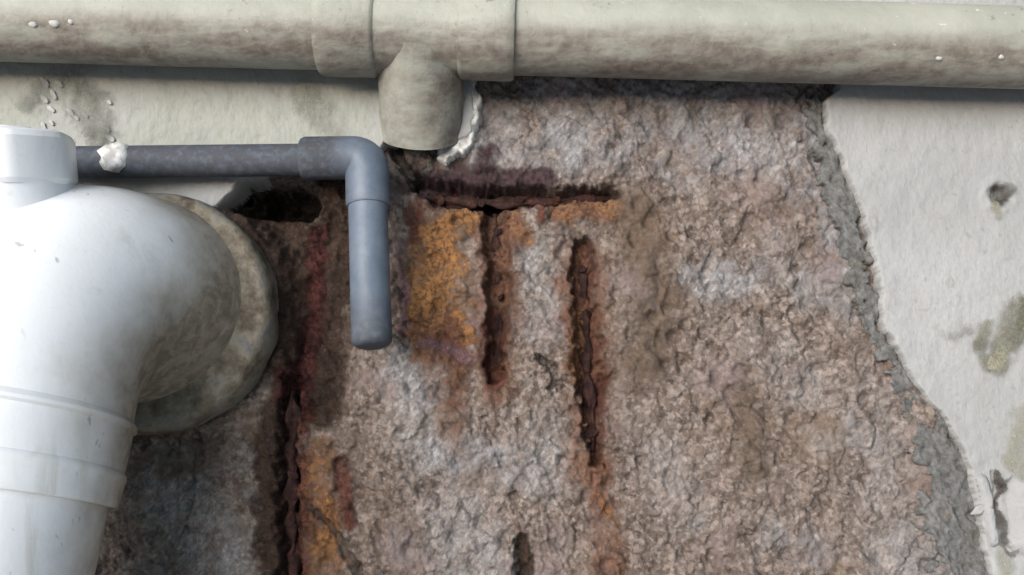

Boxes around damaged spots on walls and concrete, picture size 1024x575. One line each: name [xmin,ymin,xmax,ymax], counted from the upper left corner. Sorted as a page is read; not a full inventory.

rust [227,180,357,575]
rust [396,143,625,397]
spalling [95,76,989,575]
rust [555,241,614,517]
leakage [951,293,1024,373]
hole [992,184,1016,218]